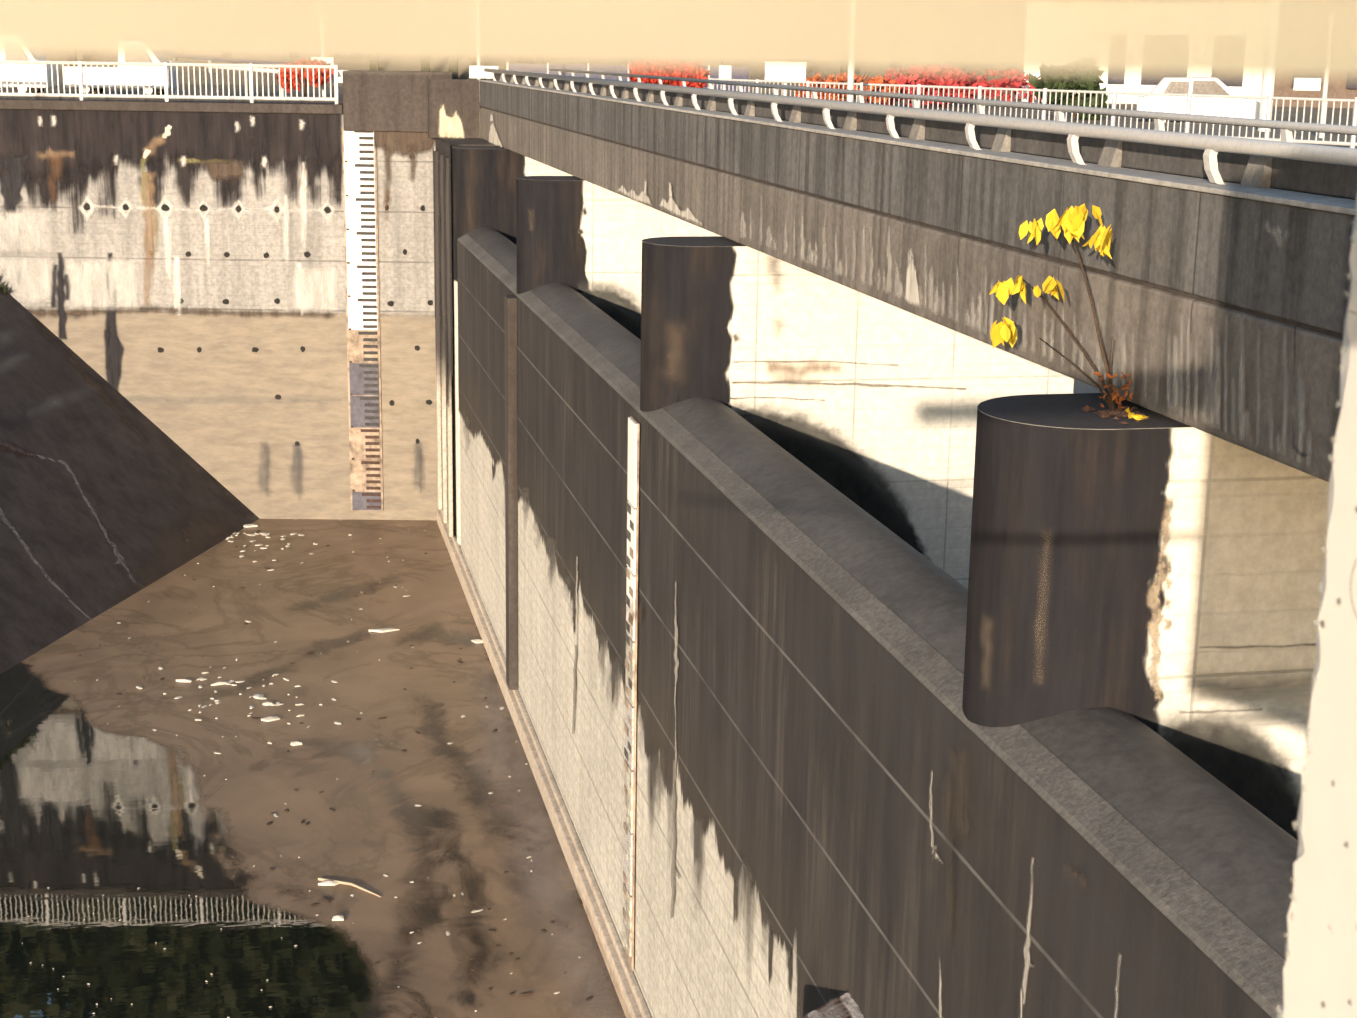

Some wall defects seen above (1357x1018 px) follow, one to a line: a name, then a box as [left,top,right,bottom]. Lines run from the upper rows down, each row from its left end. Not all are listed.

corrosion [142,161,156,275]
corrosion [185,160,243,179]
water stain [0,95,439,520]
water stain [741,207,994,331]
water stain [1010,313,1063,359]
water stain [1168,351,1220,424]
crack [0,442,144,589]
peeling [1148,500,1172,699]
crack [671,585,679,918]
crack [929,777,937,856]
crack [936,977,944,1018]
crack [1021,892,1032,1018]